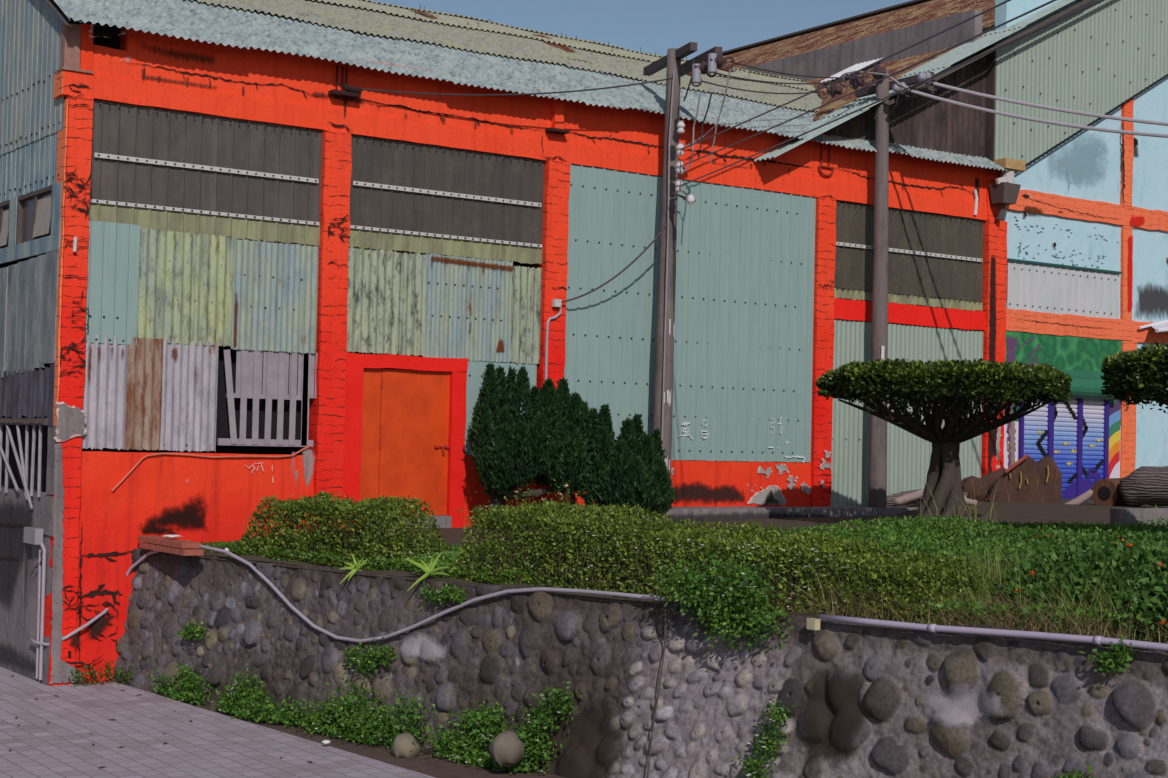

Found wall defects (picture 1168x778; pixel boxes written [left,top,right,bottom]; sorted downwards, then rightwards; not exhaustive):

crack [66,83,91,106]
crack [128,62,352,132]
crack [366,101,973,199]
water stain [1058,141,1105,182]
water stain [1137,285,1168,317]
spalling [54,401,87,442]
water stain [674,482,745,503]
peeling [747,450,832,506]
water stain [145,500,206,528]
crack [0,523,134,670]